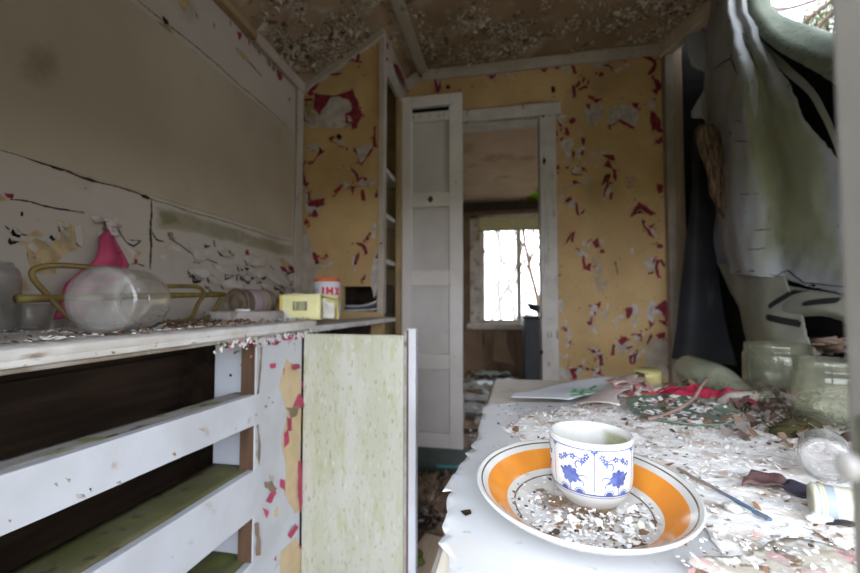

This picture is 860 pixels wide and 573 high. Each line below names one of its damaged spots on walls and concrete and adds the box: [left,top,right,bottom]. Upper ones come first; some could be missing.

peeling [409,0,705,67]
peeling [571,64,615,109]
peeling [632,103,663,145]
peeling [8,215,145,274]
crack [1,150,288,269]
peeling [153,126,378,303]
peeling [566,232,597,271]
peeling [630,199,666,278]
peeling [569,300,669,381]
peeling [213,329,343,556]
peeling [275,524,302,573]